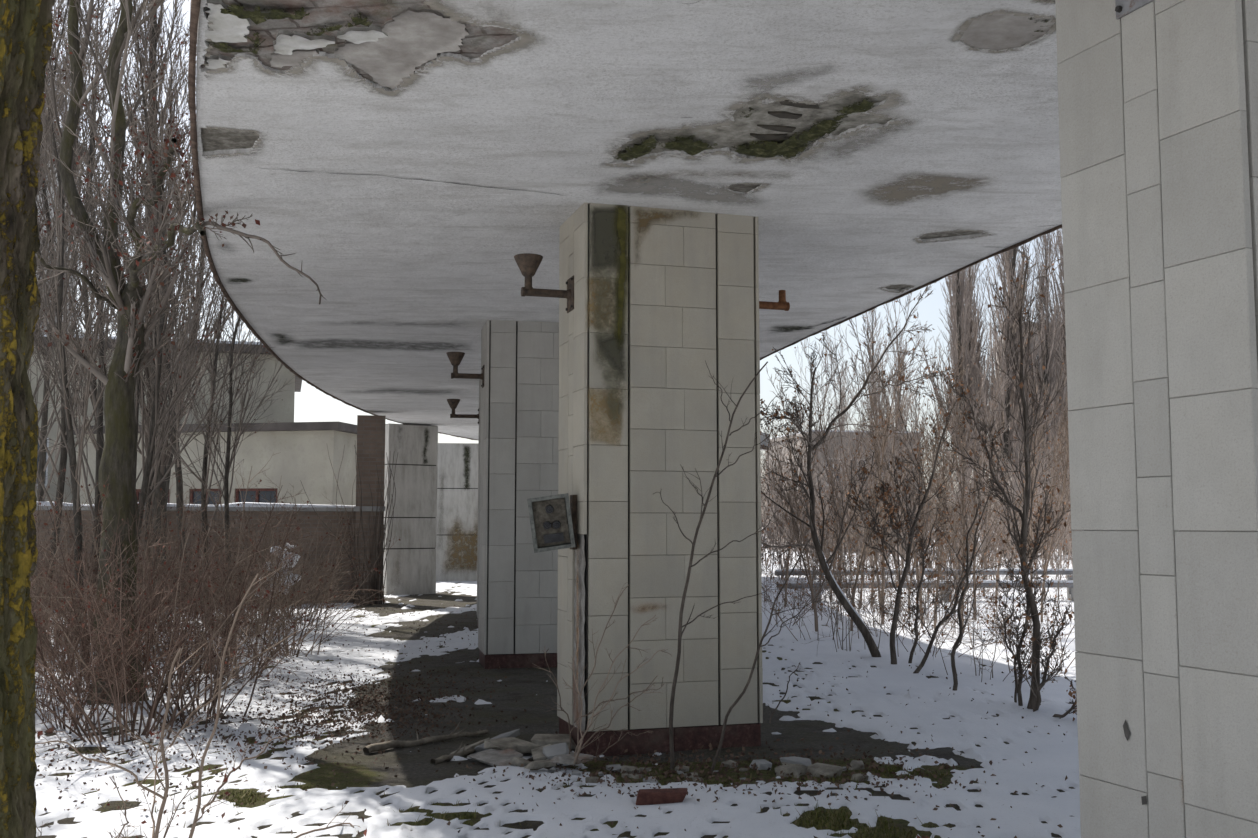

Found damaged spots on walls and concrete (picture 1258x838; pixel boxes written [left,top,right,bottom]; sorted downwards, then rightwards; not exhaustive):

spalling [201,0,537,96]
peeling [952,0,1056,53]
spalling [605,86,908,183]
leakage [869,174,983,205]